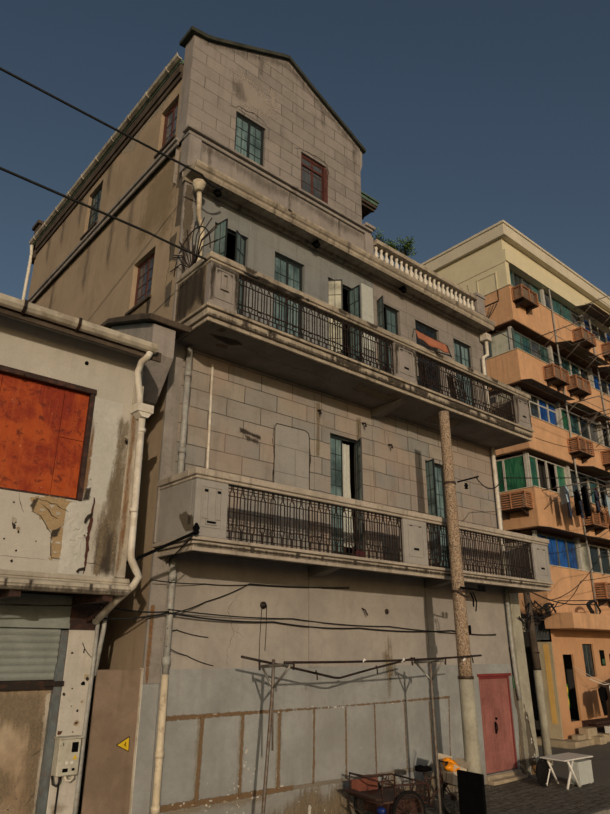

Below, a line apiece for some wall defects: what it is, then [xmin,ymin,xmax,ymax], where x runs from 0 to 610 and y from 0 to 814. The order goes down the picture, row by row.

flaking render [30,495,72,560]
leakage [94,416,135,575]
flaking render [25,693,51,814]